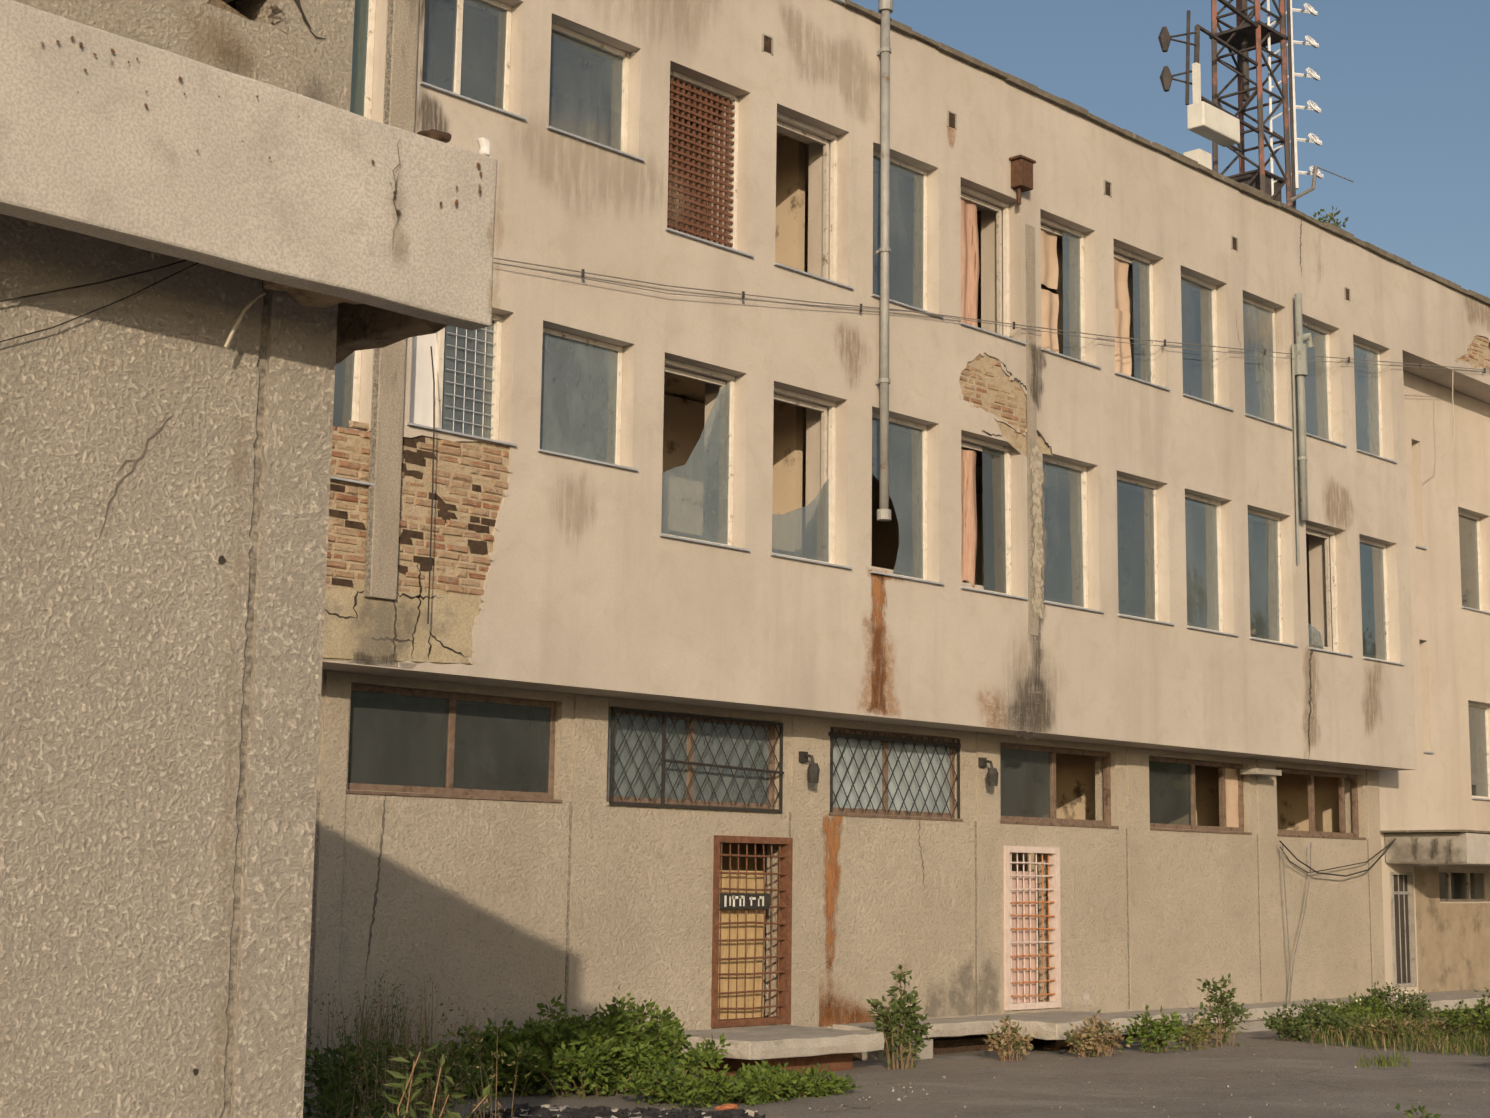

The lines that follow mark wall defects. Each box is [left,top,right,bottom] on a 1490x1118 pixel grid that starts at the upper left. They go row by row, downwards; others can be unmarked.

flaking render [180,0,249,20]
crack [392,139,401,245]
spalling [1455,336,1490,371]
crack [99,415,173,538]
flaking render [326,420,371,590]
flaking render [397,436,513,625]
flaking render [959,351,1052,620]
flaking render [323,649,475,665]
corrosion [868,569,899,715]
water stain [1010,619,1050,740]
corrosion [823,816,842,967]
corrosion [819,998,874,1027]